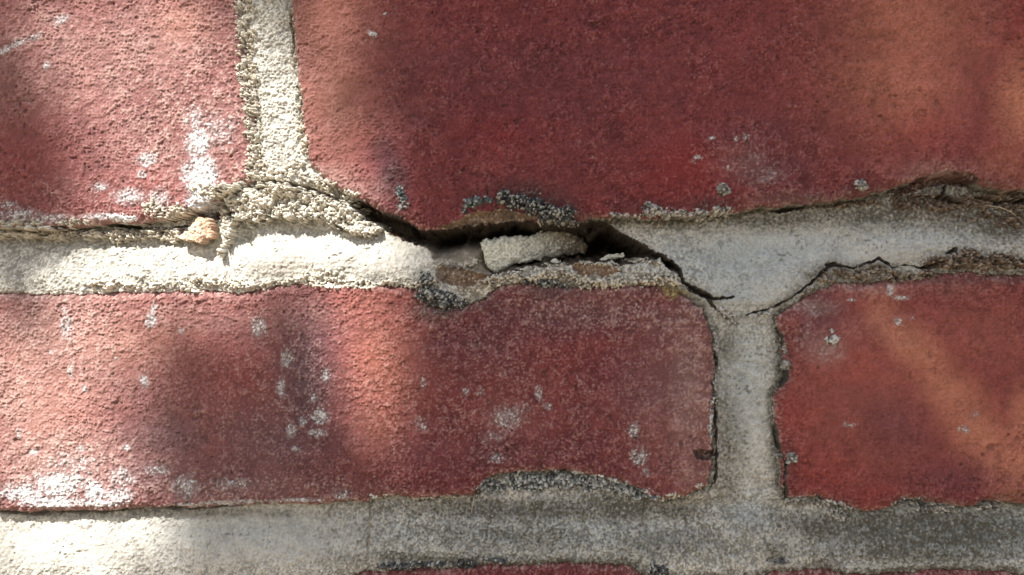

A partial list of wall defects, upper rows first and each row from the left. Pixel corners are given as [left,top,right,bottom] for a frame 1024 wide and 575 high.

crack [289,21,297,58]
crack [930,184,1024,204]
crack [251,58,958,388]
peeling [609,212,644,222]
peeling [515,257,685,292]
crack [706,404,719,493]
crack [772,423,789,498]